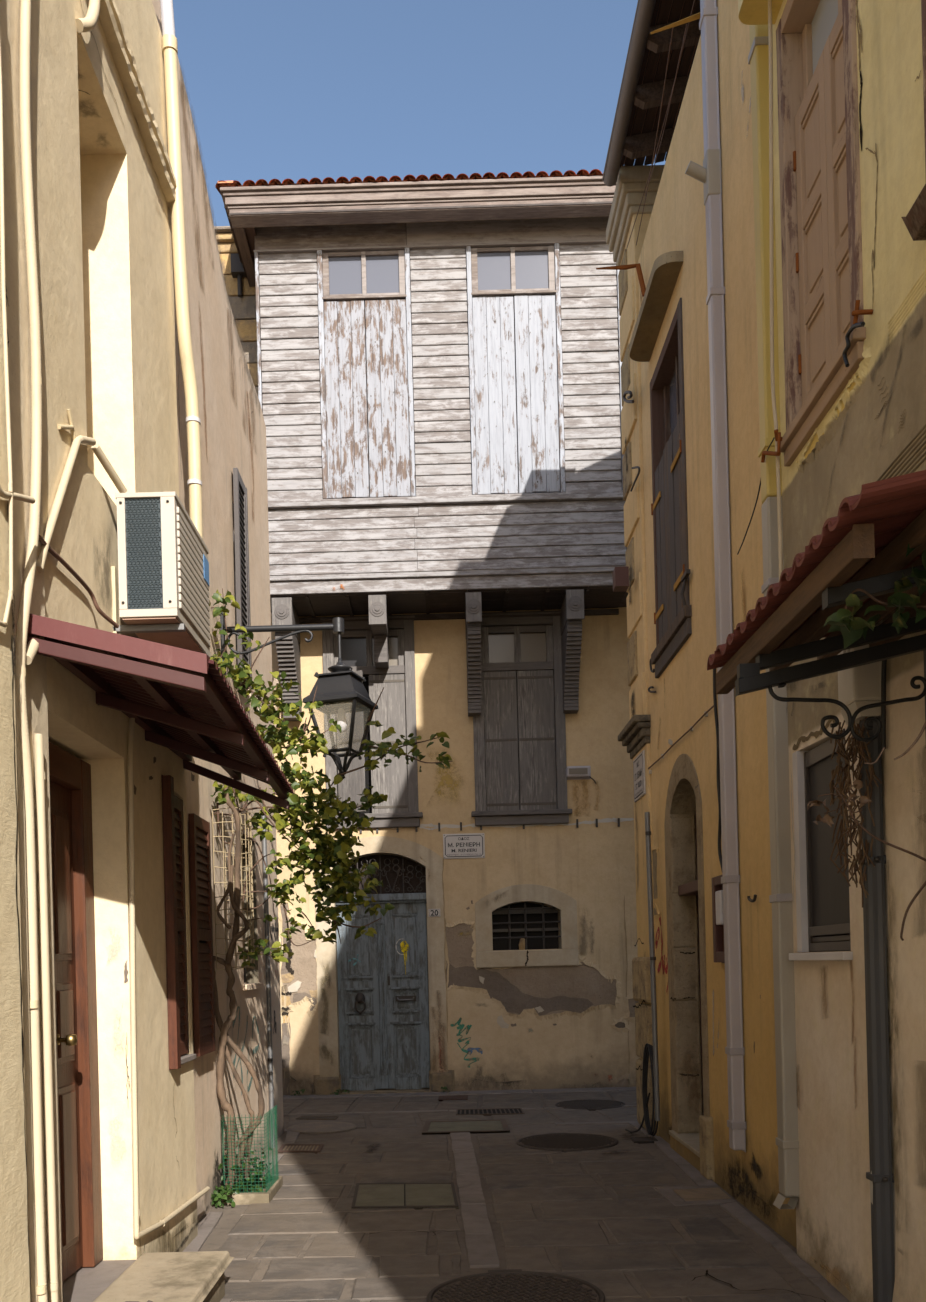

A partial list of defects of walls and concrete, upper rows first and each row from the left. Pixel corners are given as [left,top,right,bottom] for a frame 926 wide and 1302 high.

flaking render [278,900,318,1095]
flaking render [444,900,632,1033]
water stain [724,1153,773,1217]